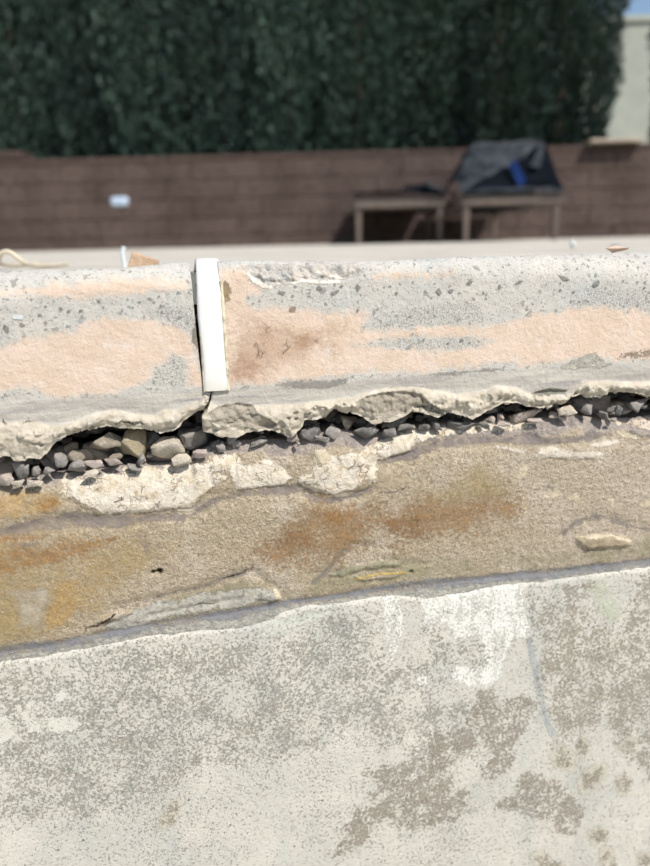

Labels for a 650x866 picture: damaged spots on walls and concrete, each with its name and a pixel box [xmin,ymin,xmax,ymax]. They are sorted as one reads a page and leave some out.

spalling [532,389,567,397]
peeling [61,391,532,515]
peeling [535,416,650,460]